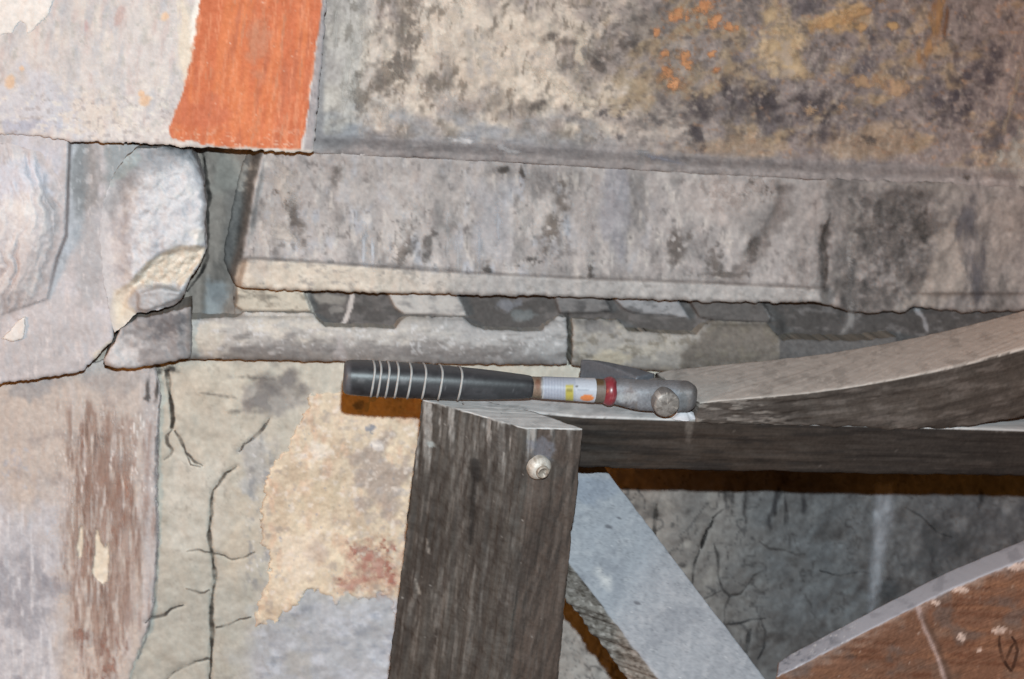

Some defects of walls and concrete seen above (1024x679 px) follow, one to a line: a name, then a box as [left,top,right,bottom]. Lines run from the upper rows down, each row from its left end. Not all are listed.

crack [156,369,199,465]
crack [145,418,270,679]
flaking render [254,391,422,627]
crack [692,514,756,598]
crack [729,618,766,659]